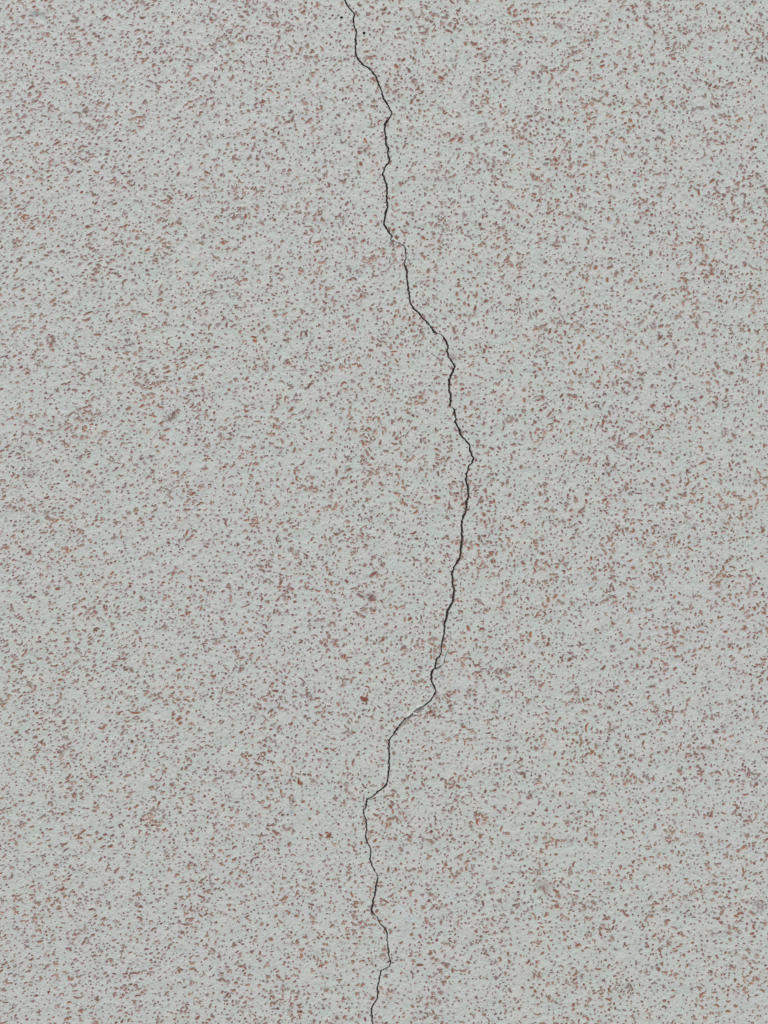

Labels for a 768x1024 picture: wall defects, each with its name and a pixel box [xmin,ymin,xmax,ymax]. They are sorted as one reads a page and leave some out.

crack [344,0,475,1024]